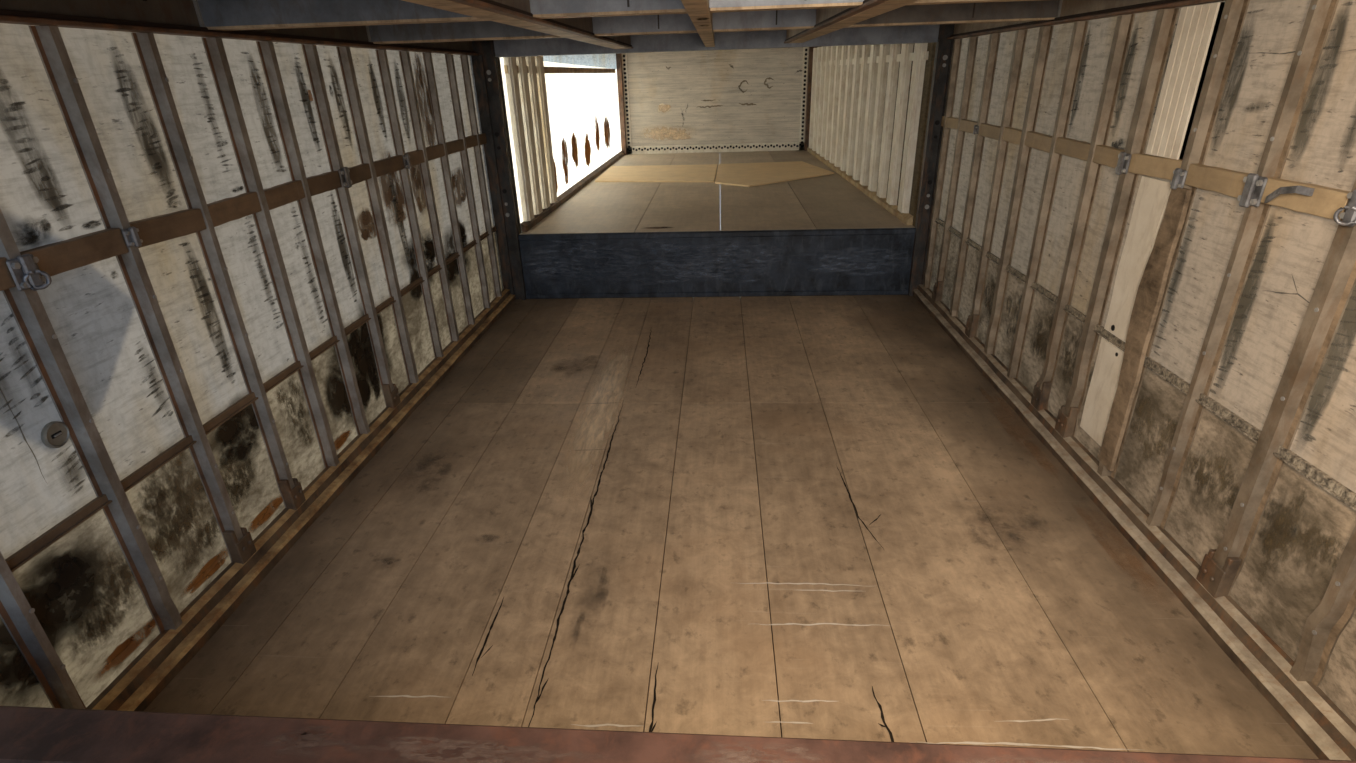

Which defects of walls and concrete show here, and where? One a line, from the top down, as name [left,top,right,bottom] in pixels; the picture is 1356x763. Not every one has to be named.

water stain [0,77,100,245]
water stain [245,216,283,328]
water stain [292,211,327,322]
water stain [326,195,390,423]
water stain [379,155,469,300]
water stain [1162,199,1201,319]
water stain [137,453,217,568]
mould [214,404,260,510]
crack [528,332,651,727]
mould [22,547,136,654]
water stain [0,618,43,703]
crack [872,687,894,742]